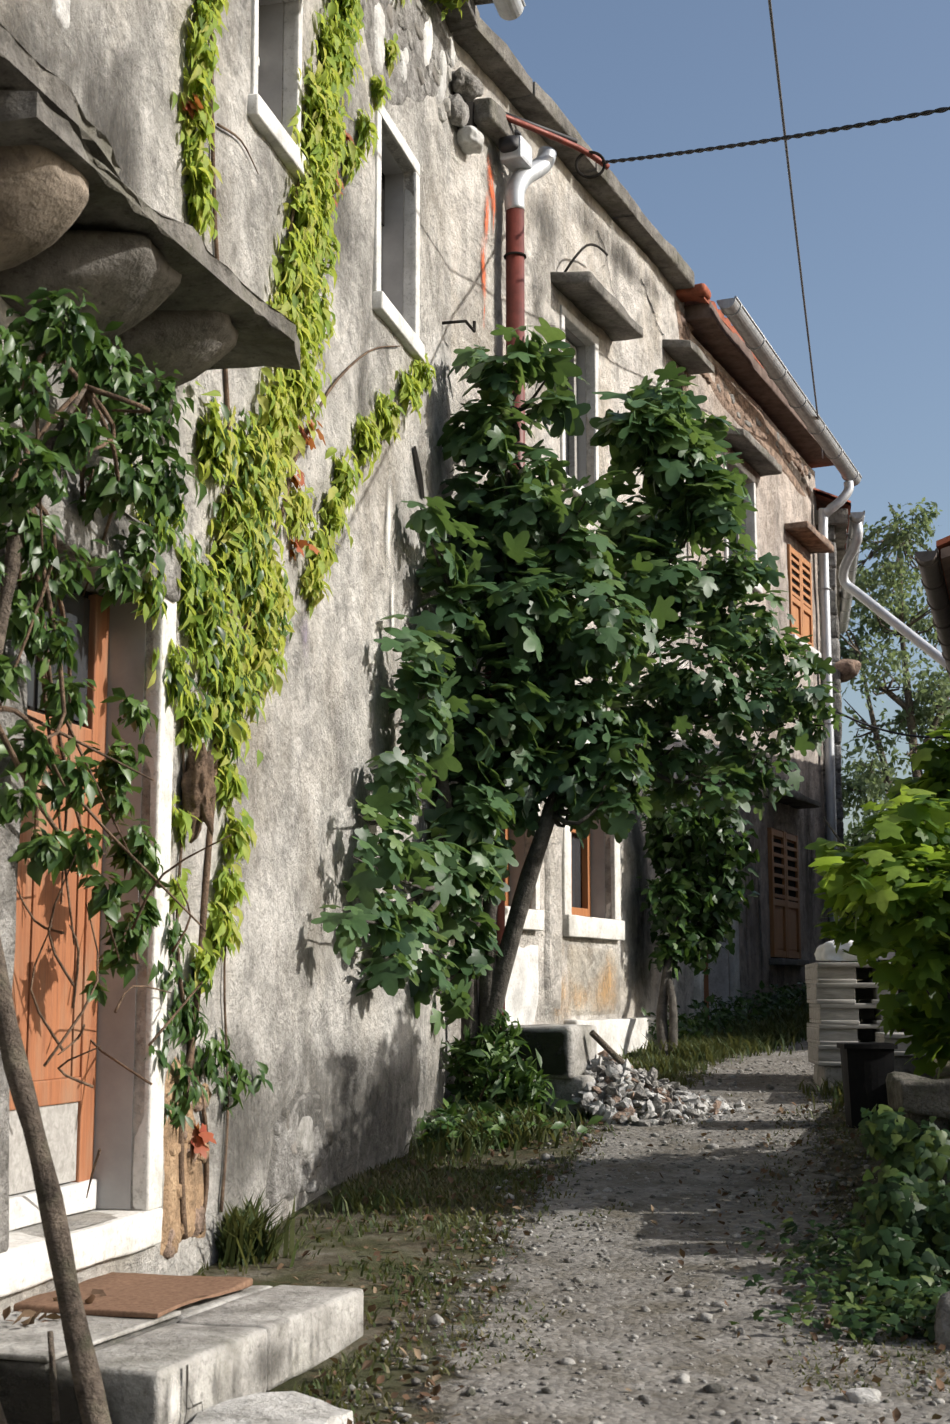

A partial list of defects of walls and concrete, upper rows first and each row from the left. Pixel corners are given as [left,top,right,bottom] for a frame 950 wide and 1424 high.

flaking render [360,0,518,155]
rust [482,166,495,313]
spalling [675,300,811,497]